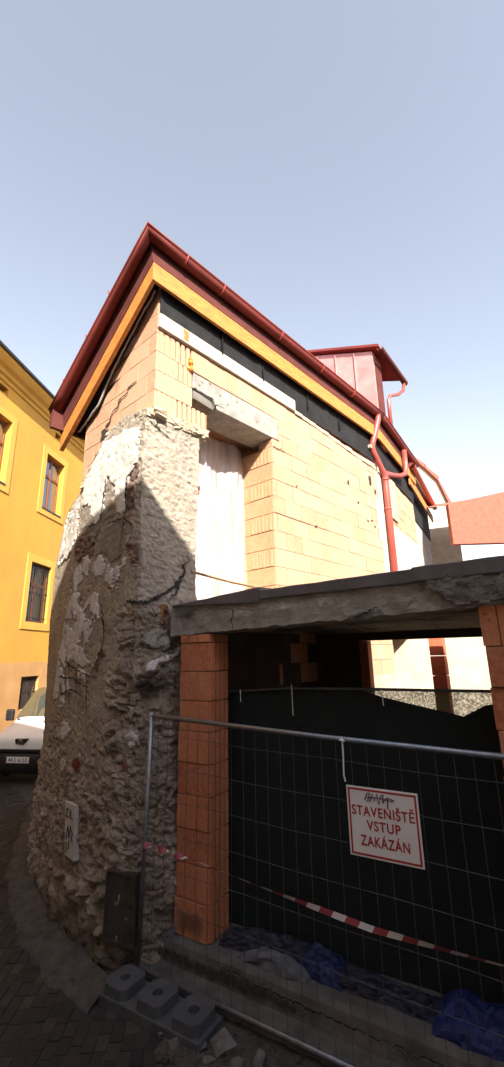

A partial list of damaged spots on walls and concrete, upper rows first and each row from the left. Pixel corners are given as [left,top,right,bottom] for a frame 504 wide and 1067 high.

crack [105,380,136,428]
flaking render [53,426,142,708]
crack [59,559,189,712]
spalling [426,572,504,605]